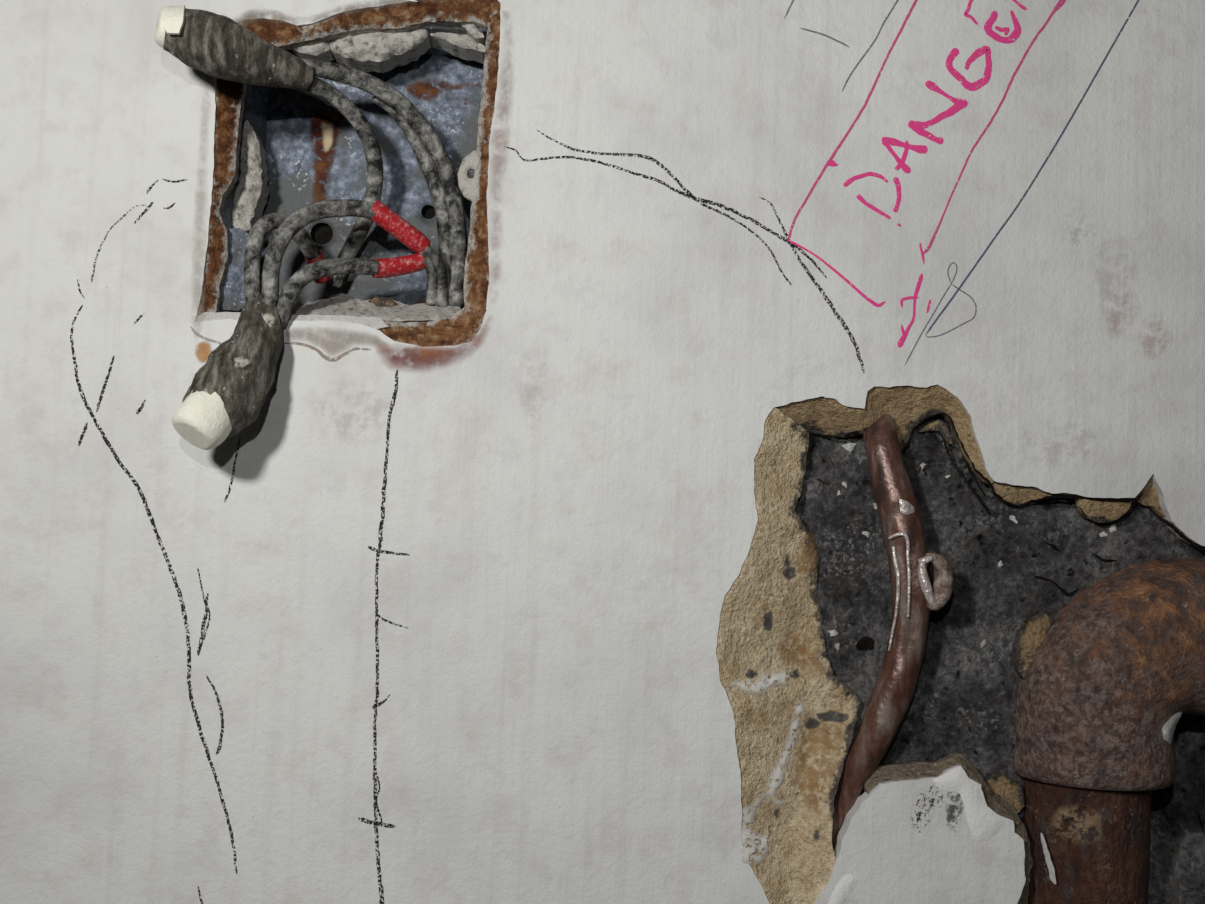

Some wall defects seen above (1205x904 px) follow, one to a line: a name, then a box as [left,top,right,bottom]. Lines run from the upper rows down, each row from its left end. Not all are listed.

flaking render [716,385,1205,904]